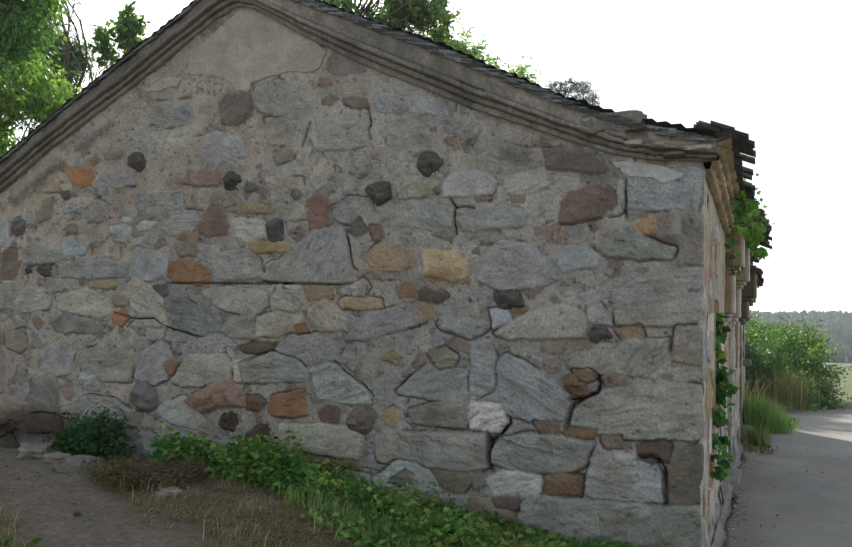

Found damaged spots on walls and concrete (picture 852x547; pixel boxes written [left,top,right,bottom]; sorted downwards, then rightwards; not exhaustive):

flaking render [707,403,728,514]